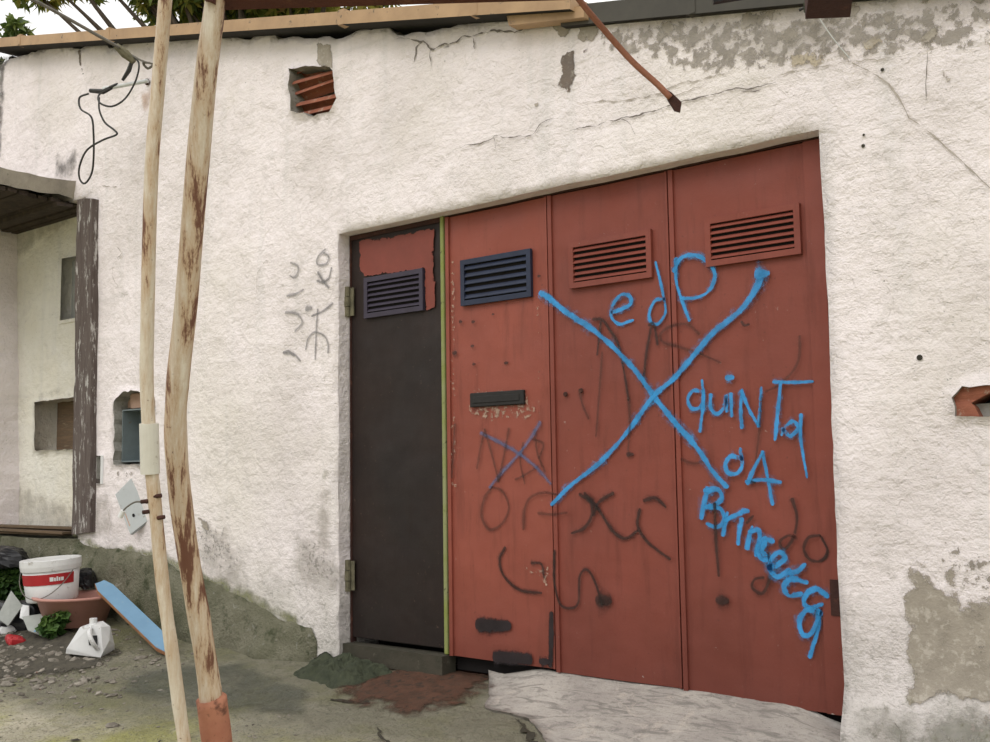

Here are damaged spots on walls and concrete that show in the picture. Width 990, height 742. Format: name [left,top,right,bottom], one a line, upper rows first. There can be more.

crack [397,29,523,61]
peeling [553,0,990,92]
crack [462,119,549,148]
crack [572,57,990,188]
spalling [903,543,990,705]